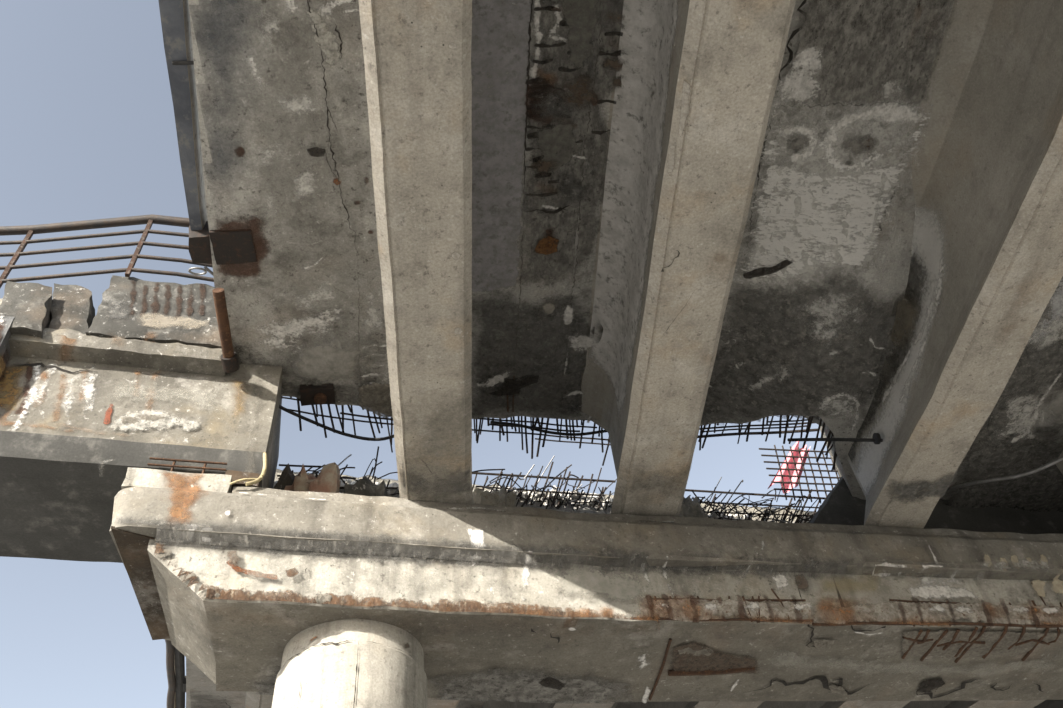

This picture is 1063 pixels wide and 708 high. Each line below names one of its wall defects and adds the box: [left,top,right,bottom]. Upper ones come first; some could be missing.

rust [218,218,268,277]
crack [307,0,361,382]
spalling [525,6,623,209]
crack [746,0,910,263]
rust [0,315,47,425]
crack [17,362,96,373]
rust [165,473,201,523]
spalling [277,383,399,497]
spalling [472,372,617,514]
damp [889,276,1063,512]
spalling [154,543,1063,700]
crack [744,676,867,695]